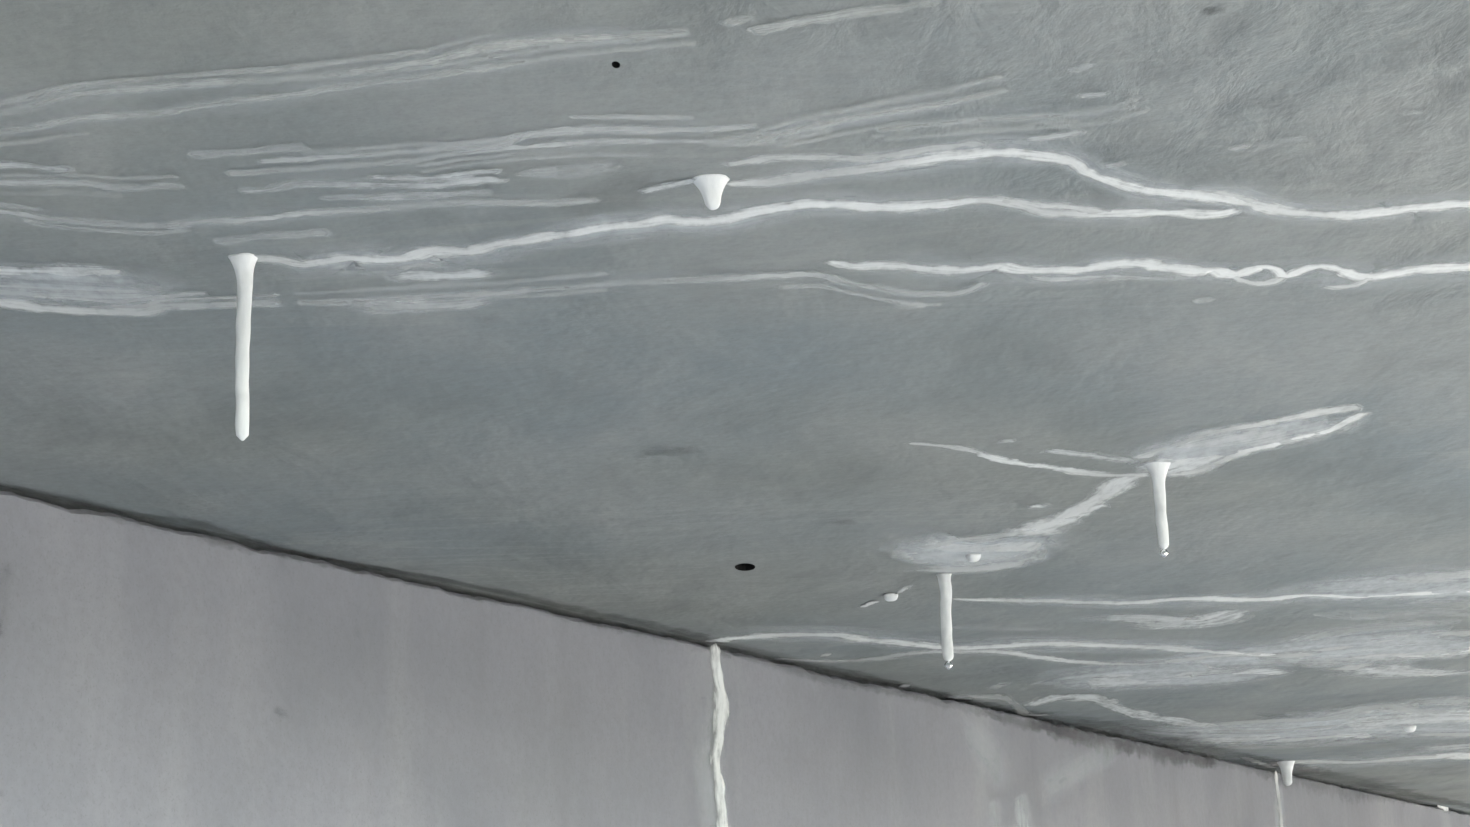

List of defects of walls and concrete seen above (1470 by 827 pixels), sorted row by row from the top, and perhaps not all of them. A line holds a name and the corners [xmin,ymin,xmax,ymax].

leakage [357,34,653,72]
leakage [238,211,323,221]
crack [256,142,1470,281]
leakage [0,265,161,316]
crack [827,259,1470,290]
leakage [900,404,1368,572]
leakage [1091,609,1249,629]
leakage [1024,631,1470,745]